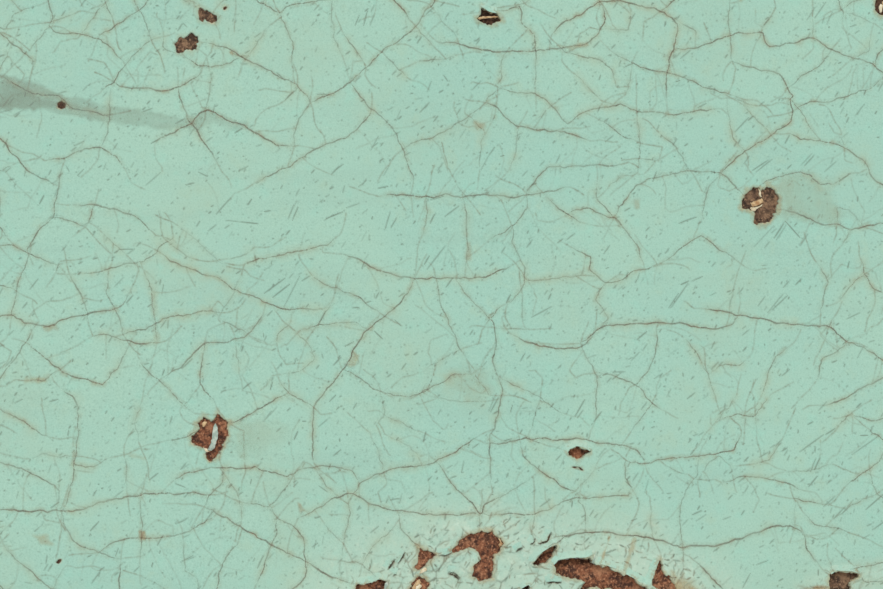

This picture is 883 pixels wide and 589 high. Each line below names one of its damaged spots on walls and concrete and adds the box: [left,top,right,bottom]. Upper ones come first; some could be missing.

crack [558,0,636,35]
crack [631,0,677,88]
crack [157,61,297,174]
crack [725,79,848,169]
crack [328,297,404,389]
crack [530,309,802,349]
crack [127,466,284,497]
crack [312,432,491,516]
crack [230,520,331,586]
peeling [437,546,464,579]
peeling [545,574,562,583]
crack [569,531,743,548]